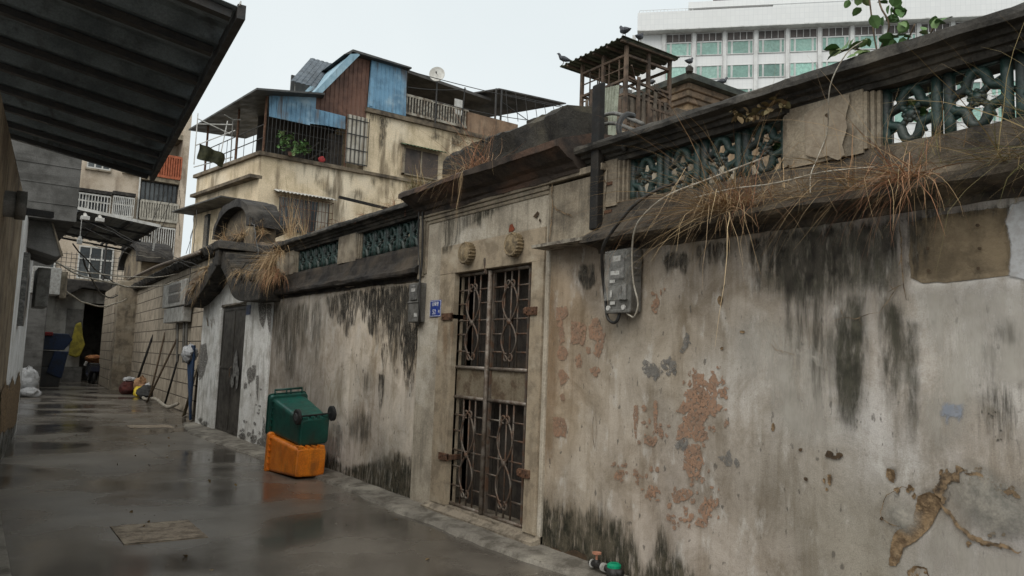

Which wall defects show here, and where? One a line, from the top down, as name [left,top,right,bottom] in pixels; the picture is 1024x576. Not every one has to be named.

water stain [665,243,730,272]
water stain [750,220,896,344]
water stain [273,286,418,406]
flaking render [556,306,605,401]
water stain [835,299,862,411]
water stain [885,305,916,411]
flaking render [611,333,729,530]
flaking render [886,468,942,576]